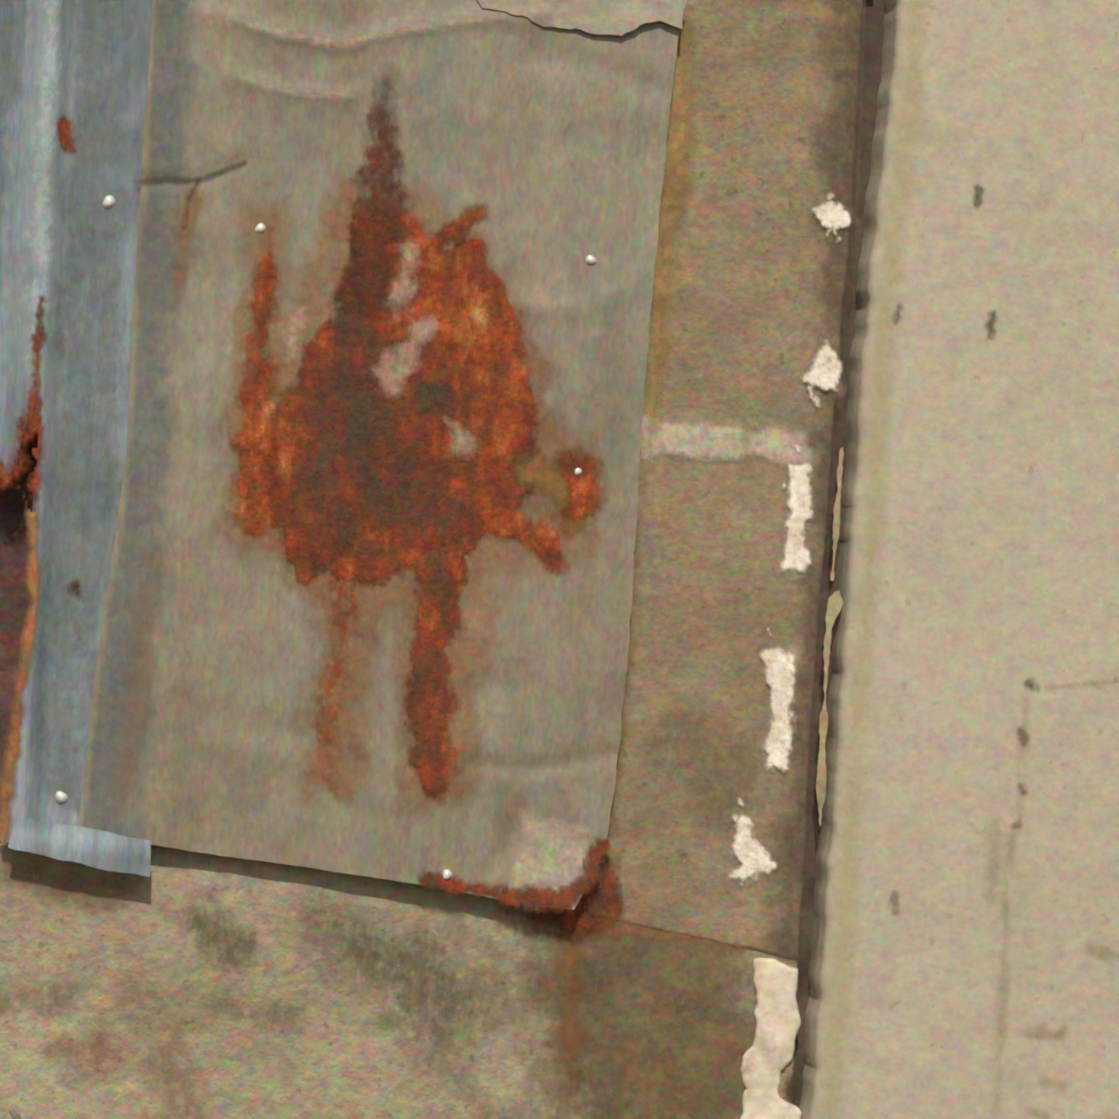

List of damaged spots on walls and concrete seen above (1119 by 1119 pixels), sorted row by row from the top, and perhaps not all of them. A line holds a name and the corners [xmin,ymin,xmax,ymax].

corrosion [643,20,692,431]
peeling [813,194,851,240]
peeling [803,334,842,406]
corrosion [229,83,600,802]
corrosion [0,297,45,844]
peeling [778,445,819,579]
peeling [761,646,800,771]
corrosion [419,821,690,965]
peeling [726,798,776,884]
spalling [787,1077,801,1101]